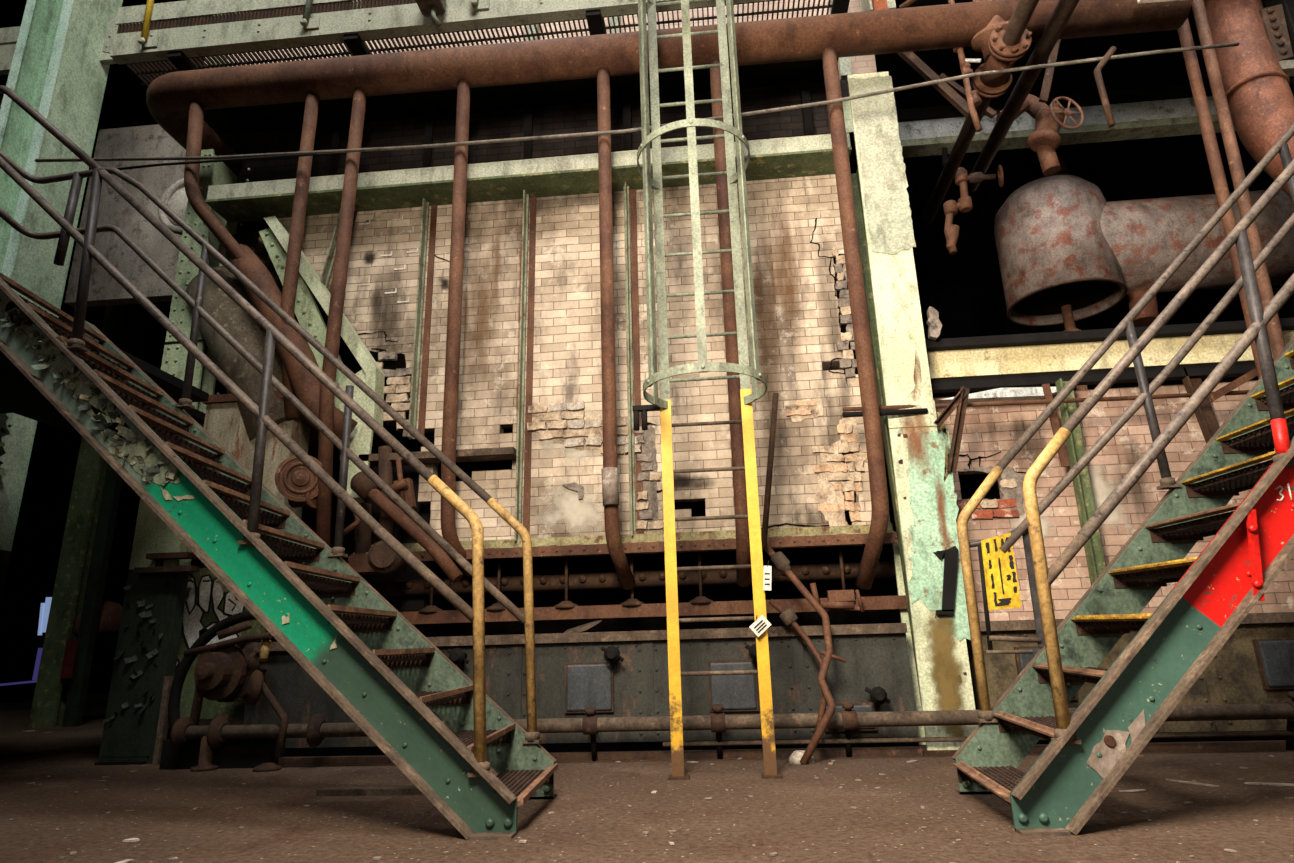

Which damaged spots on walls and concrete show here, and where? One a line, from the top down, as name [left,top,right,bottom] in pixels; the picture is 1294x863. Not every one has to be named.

peeling [413,400,1025,641]
rust [928,615,963,736]